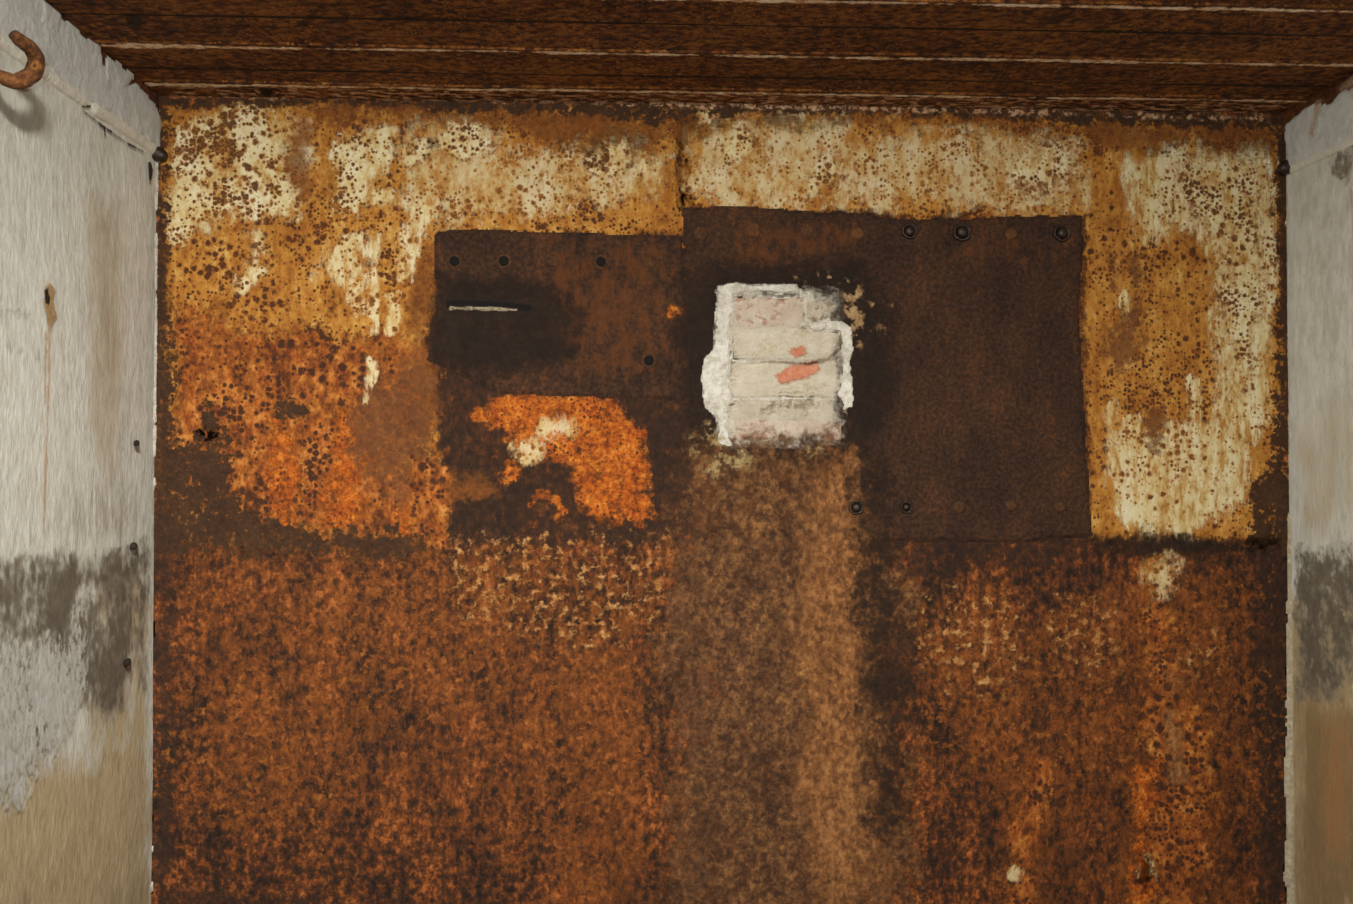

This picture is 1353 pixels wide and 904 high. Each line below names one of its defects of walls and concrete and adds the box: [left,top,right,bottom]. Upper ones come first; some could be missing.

rust [101,48,165,112]
rust [470,394,657,528]
flaking render [775,346,820,383]
rust [1192,245,1287,542]
damp [0,536,150,787]
rust [165,669,385,826]
rust [303,559,440,702]
rust [430,605,467,707]
rust [517,255,922,904]
rust [1024,655,1079,746]
rust [1234,664,1279,742]
damp [1292,543,1353,904]